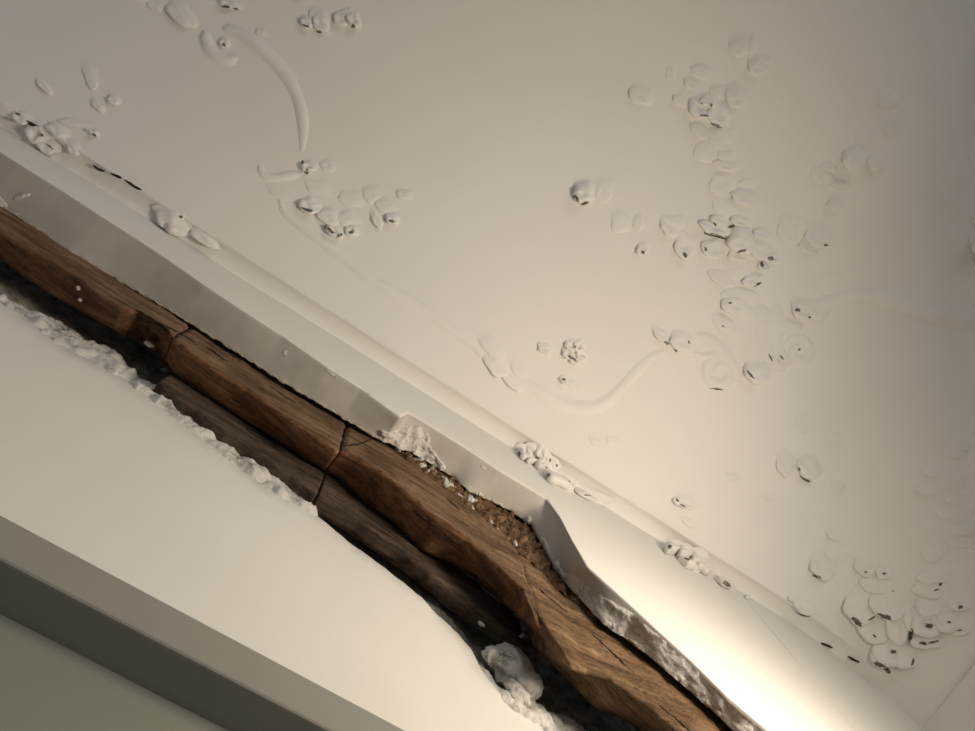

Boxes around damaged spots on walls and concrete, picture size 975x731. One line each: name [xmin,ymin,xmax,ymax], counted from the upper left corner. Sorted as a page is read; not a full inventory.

spalling [0,193,762,731]